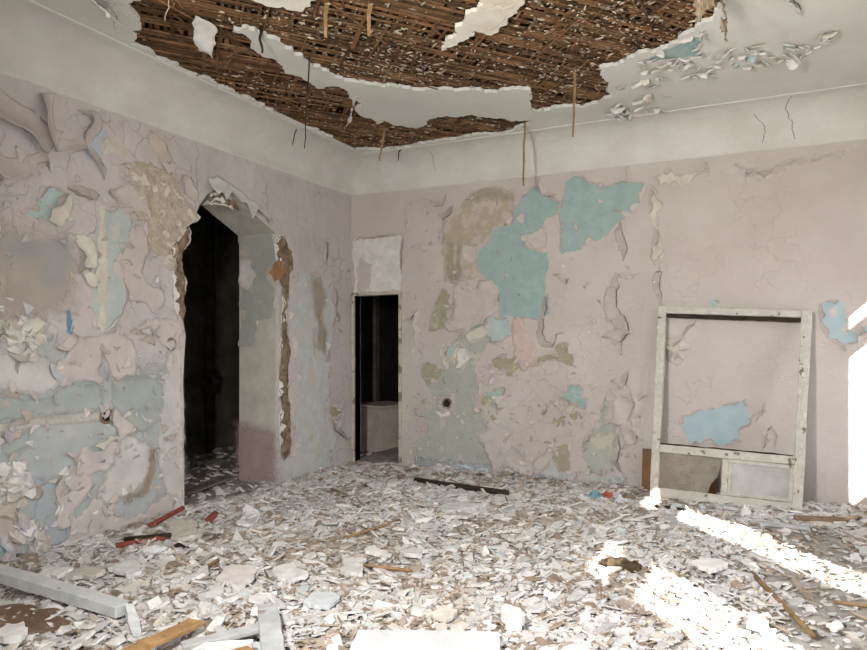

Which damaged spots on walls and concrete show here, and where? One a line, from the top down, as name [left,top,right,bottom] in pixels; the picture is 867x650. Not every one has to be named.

flaking render [91,0,838,148]
crack [781,0,802,16]
spalling [0,161,274,562]
peeling [238,233,373,480]
peeling [401,175,663,484]
peeling [655,335,691,384]
peeling [679,399,752,447]
peeling [818,298,867,352]